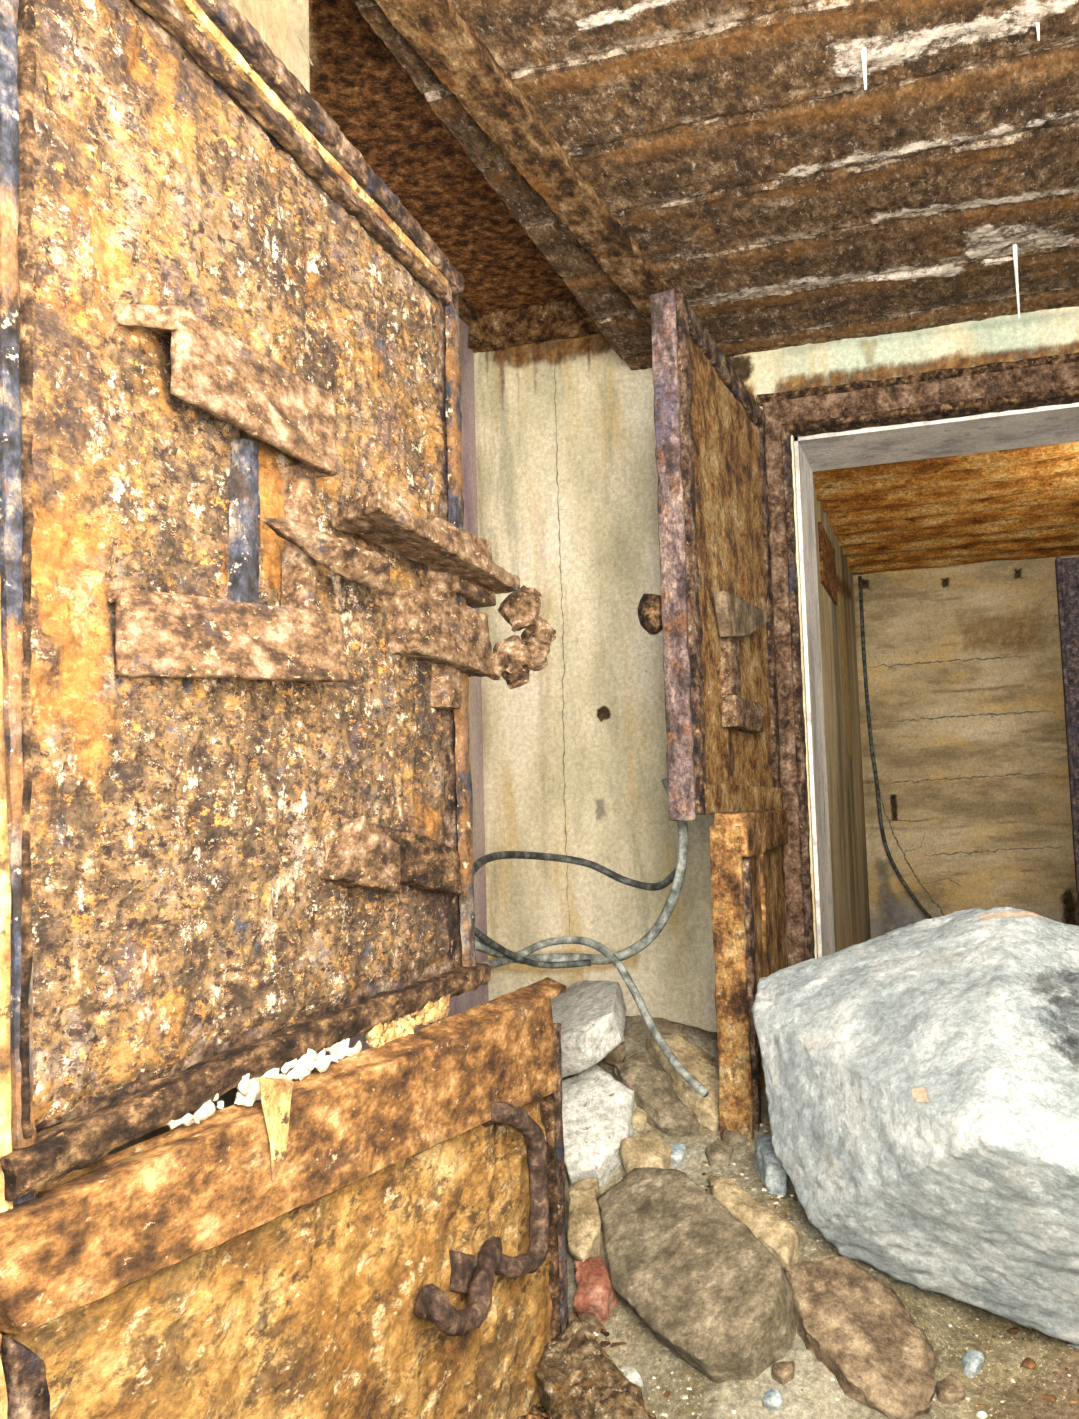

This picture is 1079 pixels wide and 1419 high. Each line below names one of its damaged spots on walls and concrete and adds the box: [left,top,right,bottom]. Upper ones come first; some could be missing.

efflorescence [575,0,684,32]
efflorescence [827,0,1078,80]